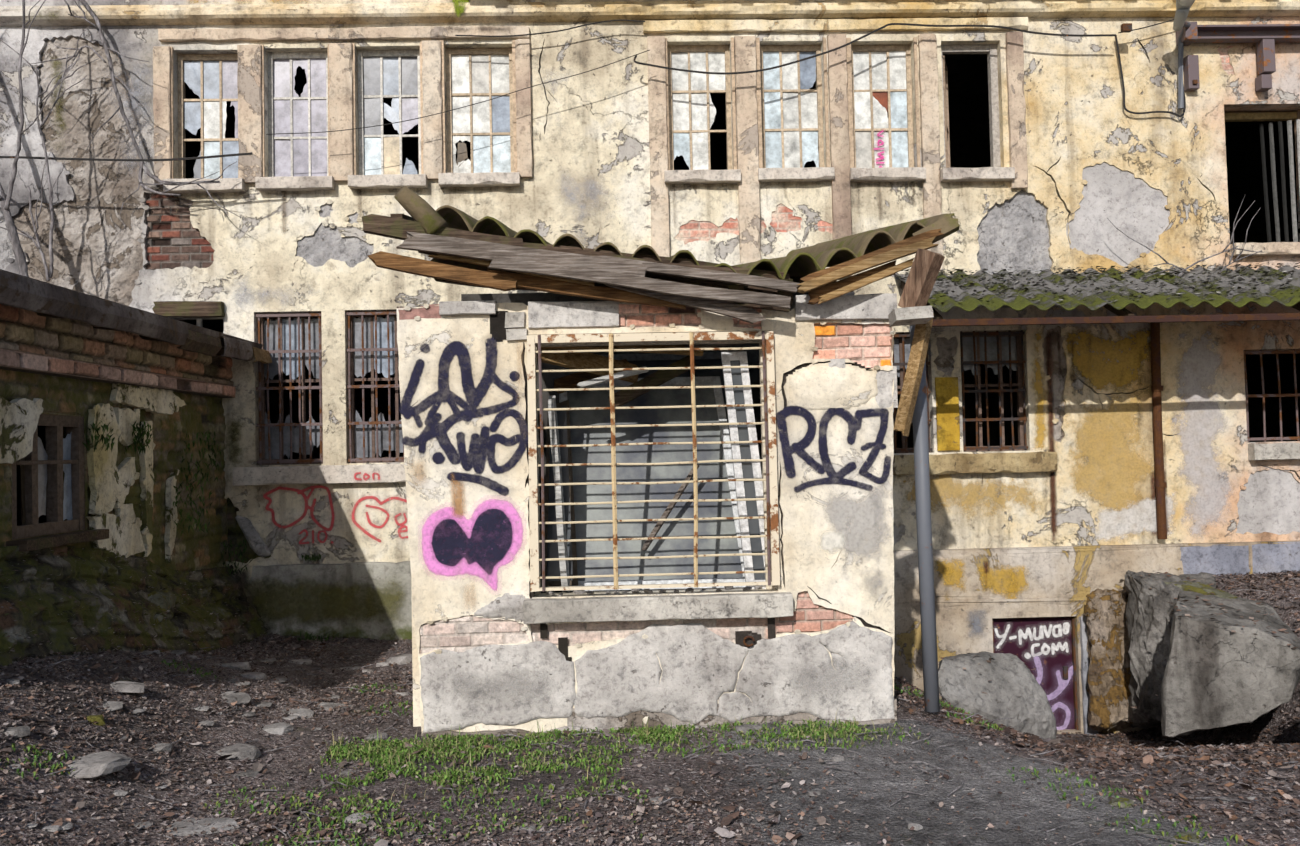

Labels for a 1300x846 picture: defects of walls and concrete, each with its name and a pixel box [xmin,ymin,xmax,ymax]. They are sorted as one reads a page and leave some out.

flaking render [0,36,215,306]
spalling [296,199,374,267]
flaking render [674,217,739,245]
flaking render [760,204,833,234]
spalling [977,190,1052,275]
peeling [1066,162,1171,267]
flaking render [811,321,898,412]
peeling [0,397,43,464]
peeling [87,383,186,564]
peeling [1236,466,1300,535]
water stain [231,570,402,627]